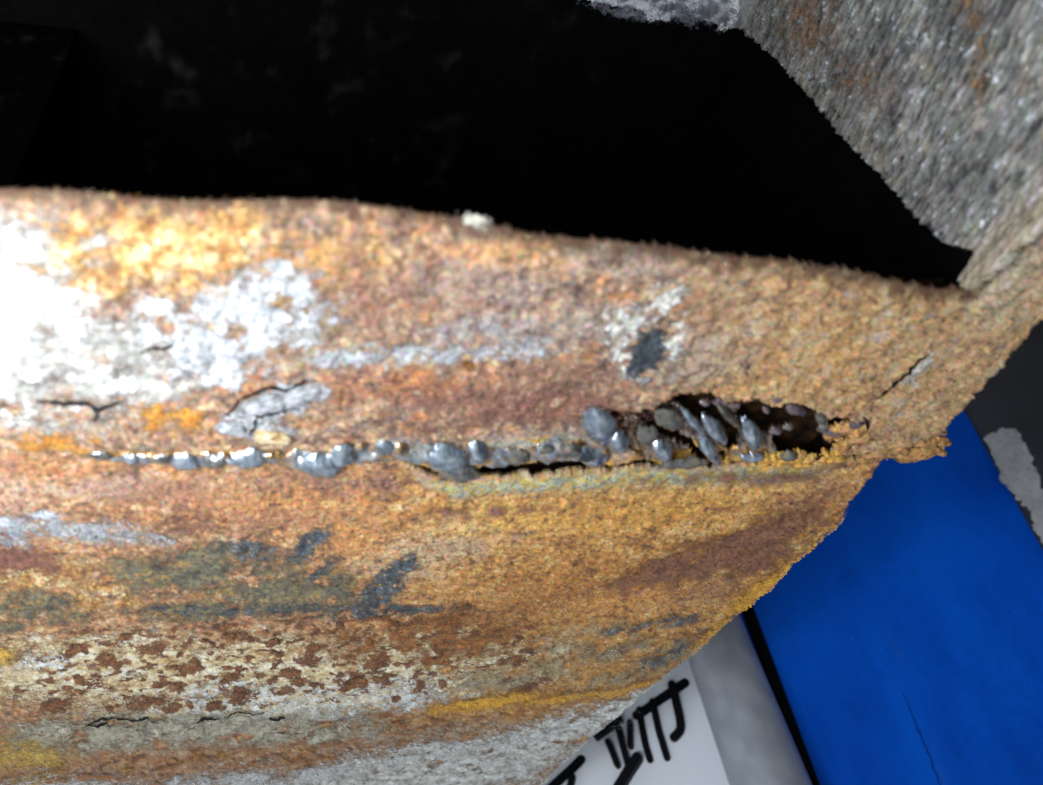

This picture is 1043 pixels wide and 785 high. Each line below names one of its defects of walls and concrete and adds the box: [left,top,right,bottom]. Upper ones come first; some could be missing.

corrosion [28,195,284,317]
peeling [0,202,349,447]
corrosion [134,402,212,439]
corrosion [369,375,646,437]
corrosion [4,430,78,453]
corrosion [630,470,828,487]
corrosion [413,504,568,523]
corrosion [571,490,844,666]
corrosion [0,534,662,785]
crack [83,717,159,728]
crack [195,711,286,724]